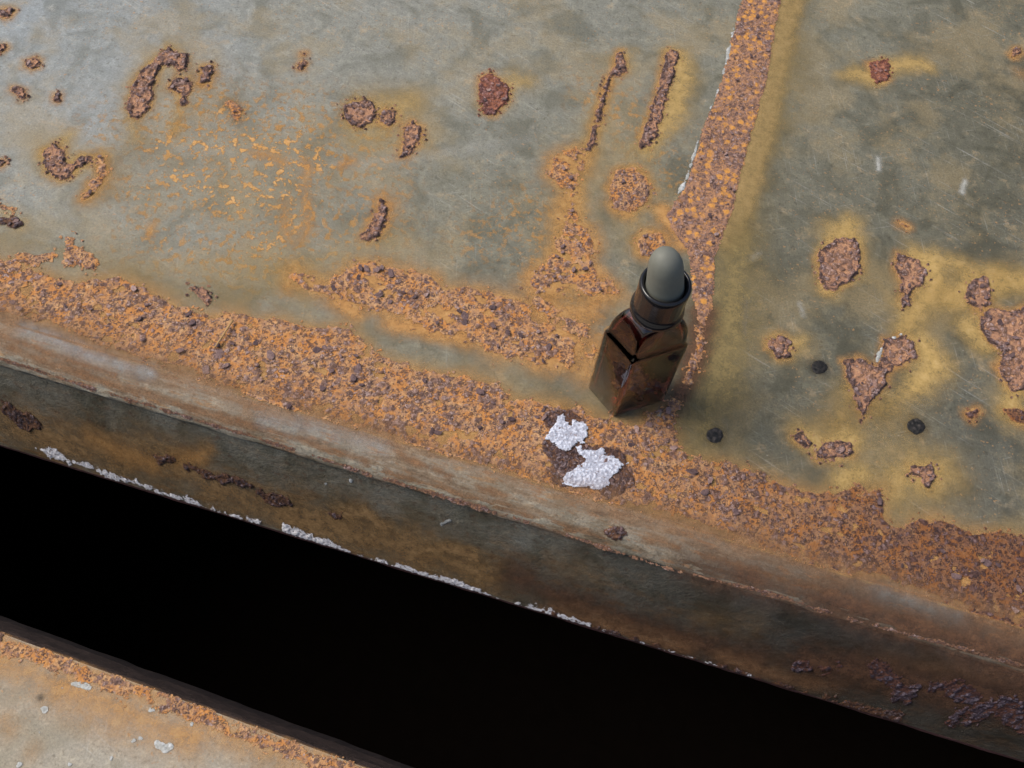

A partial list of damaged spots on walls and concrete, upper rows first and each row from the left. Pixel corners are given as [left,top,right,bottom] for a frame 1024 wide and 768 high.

rust [35,134,113,202]
rust [123,44,386,271]
rust [0,230,605,502]
rust [284,50,628,377]
rust [568,0,1024,629]
rust [0,632,359,768]
rust [0,393,1024,735]